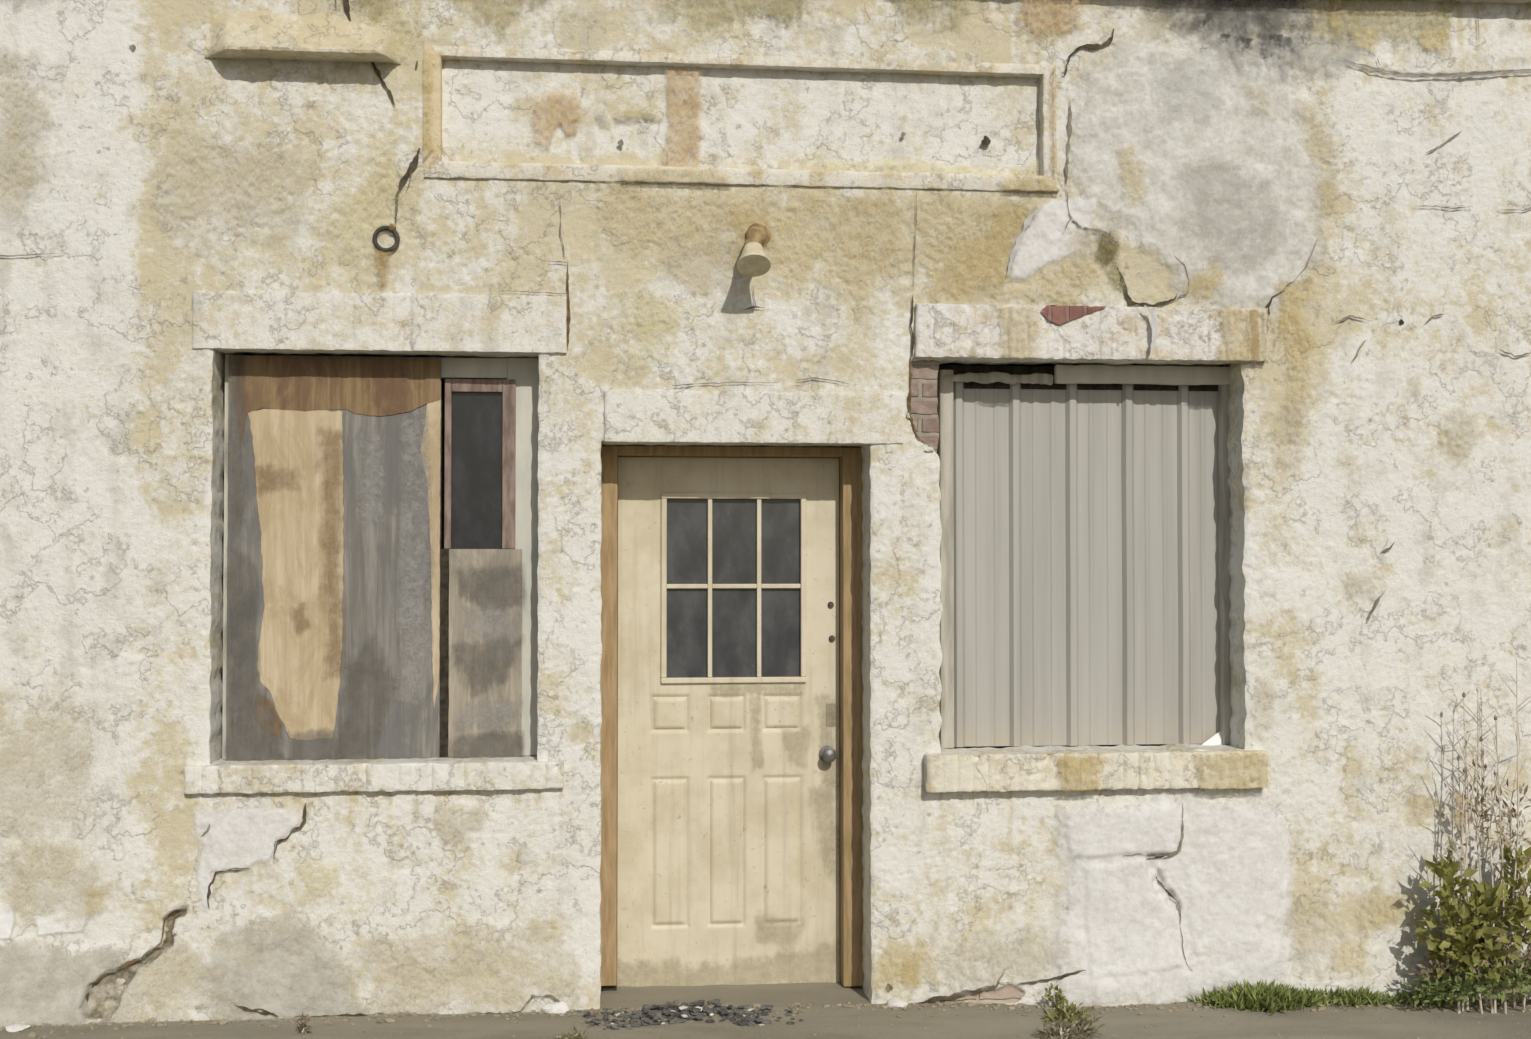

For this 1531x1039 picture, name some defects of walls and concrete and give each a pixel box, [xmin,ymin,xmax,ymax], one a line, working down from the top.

crack [335,0,351,21]
leakage [1199,0,1453,78]
crack [371,60,418,105]
crack [395,148,420,222]
crack [1062,28,1189,355]
spalling [1041,305,1106,325]
crack [1266,241,1317,334]
spalling [906,357,1218,454]
crack [207,804,307,909]
crack [1125,812,1184,857]
flaking render [80,910,187,1022]
crack [1178,900,1191,970]